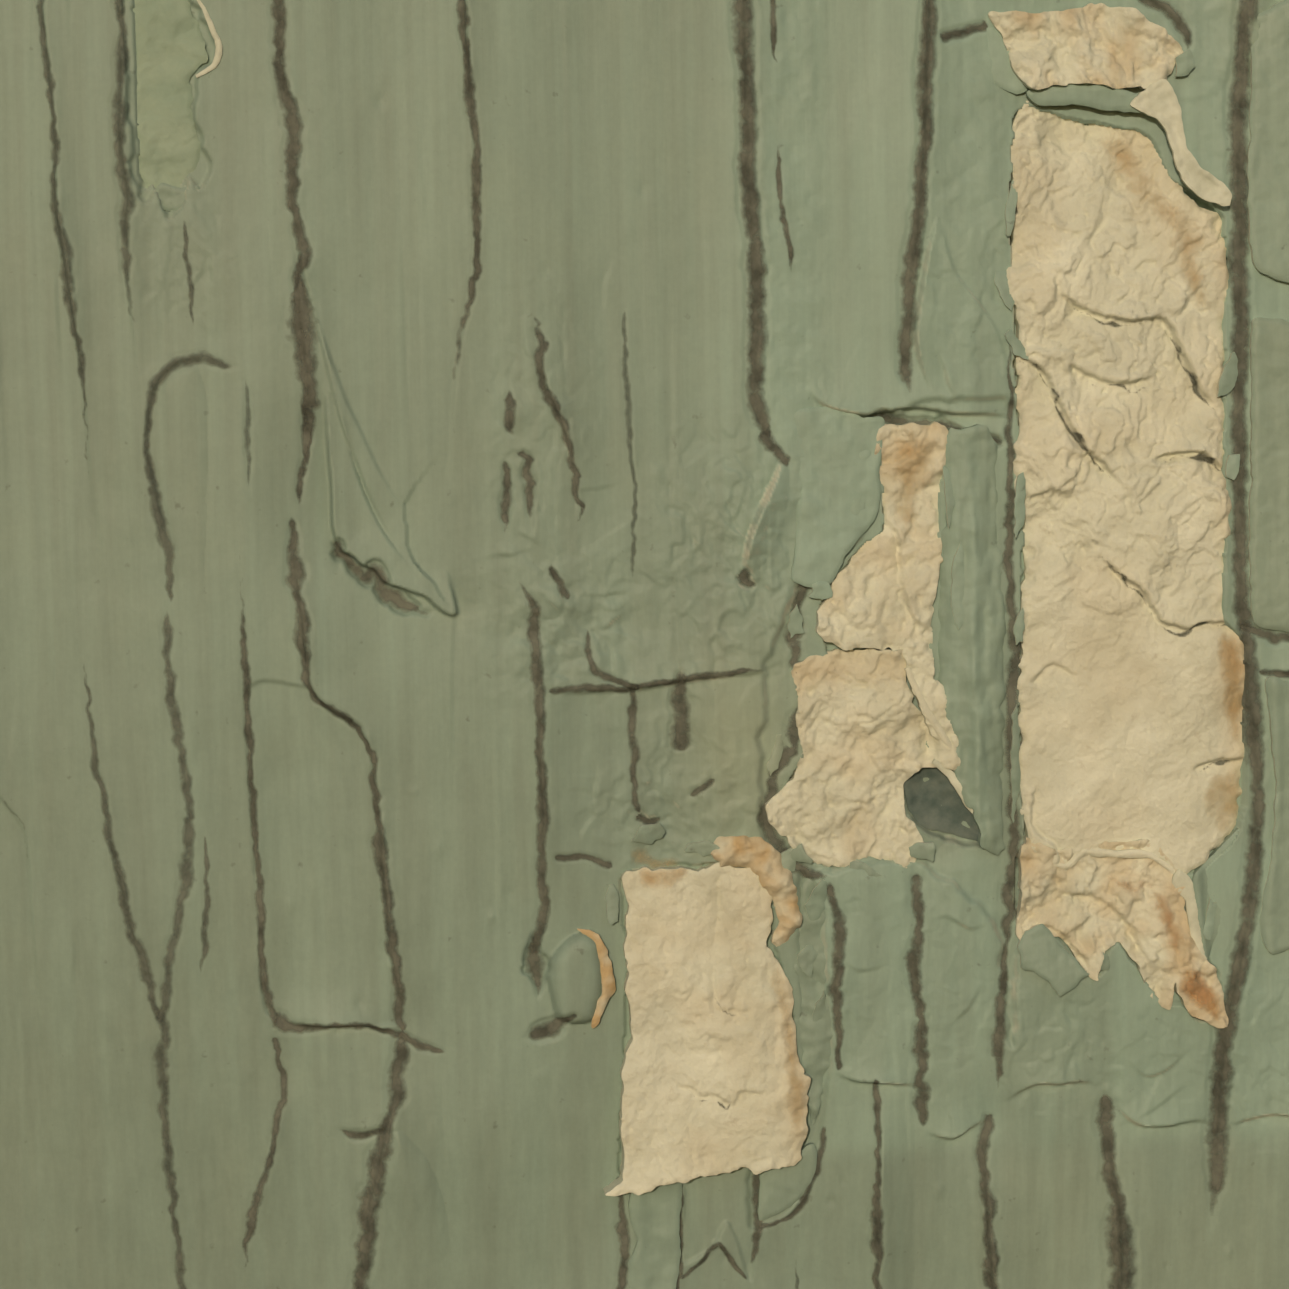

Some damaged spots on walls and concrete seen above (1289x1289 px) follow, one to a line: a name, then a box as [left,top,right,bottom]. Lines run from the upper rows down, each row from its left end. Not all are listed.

peeling [133,0,223,211]
crack [457,0,481,357]
crack [734,0,793,466]
crack [899,0,988,383]
crack [86,354,228,1289]
crack [241,0,443,1289]
crack [526,567,750,988]
crack [758,709,846,1070]
crack [907,875,929,1124]
peeling [603,0,1289,1289]
crack [992,352,1020,1079]
crack [1209,0,1289,1193]